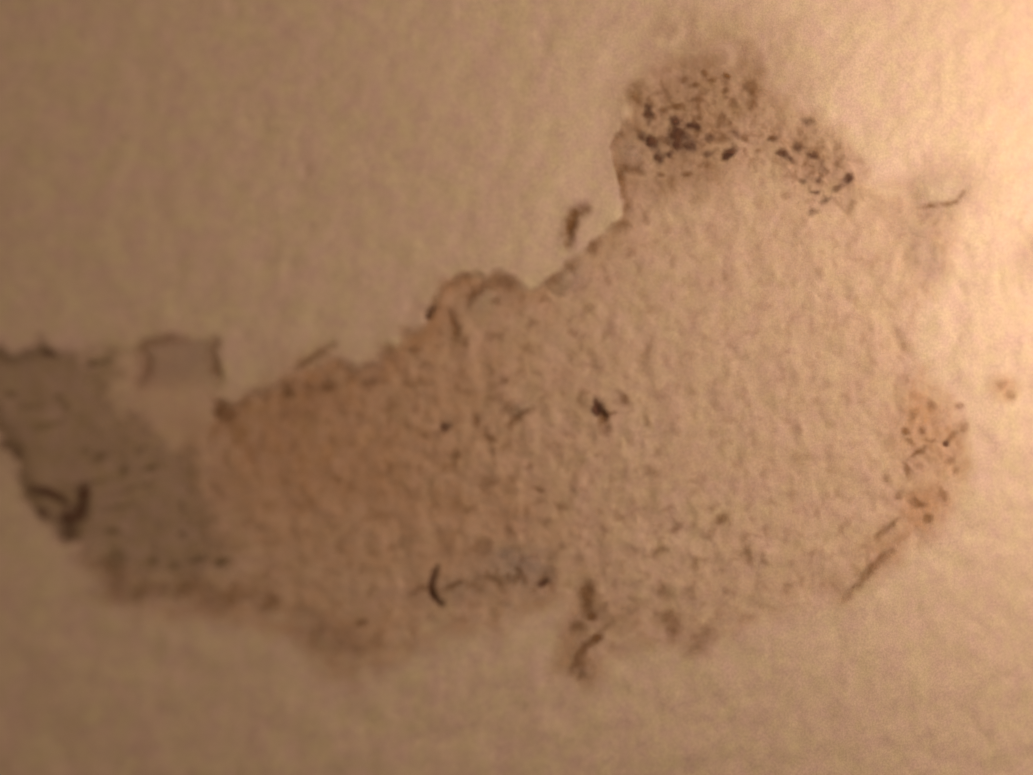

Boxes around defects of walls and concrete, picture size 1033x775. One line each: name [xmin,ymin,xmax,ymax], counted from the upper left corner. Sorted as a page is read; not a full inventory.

damp [639,106,699,162]
spalling [566,209,580,245]